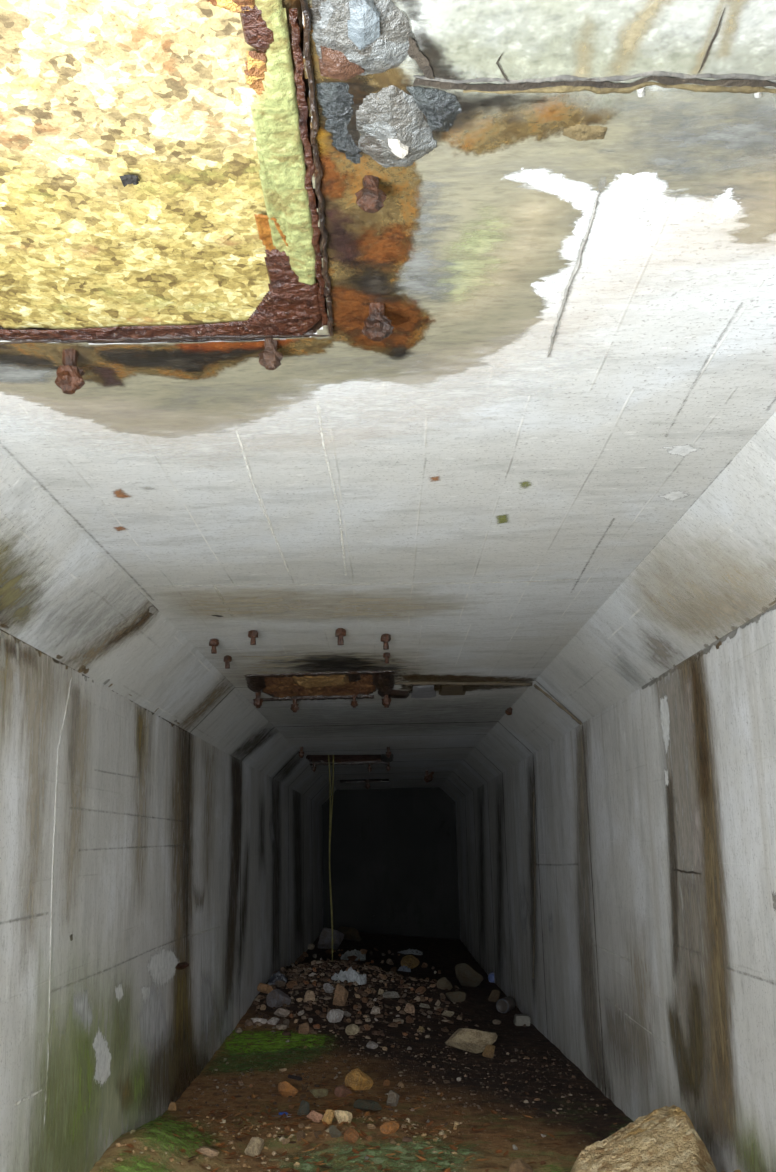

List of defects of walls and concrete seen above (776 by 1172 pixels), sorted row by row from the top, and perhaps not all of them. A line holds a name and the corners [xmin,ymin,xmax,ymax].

water stain [0,0,776,438]
corrosion [303,5,533,359]
crack [547,191,600,358]
water stain [0,539,46,853]
water stain [137,712,149,884]
water stain [145,680,303,1112]
water stain [272,654,649,1095]
water stain [648,637,736,1145]